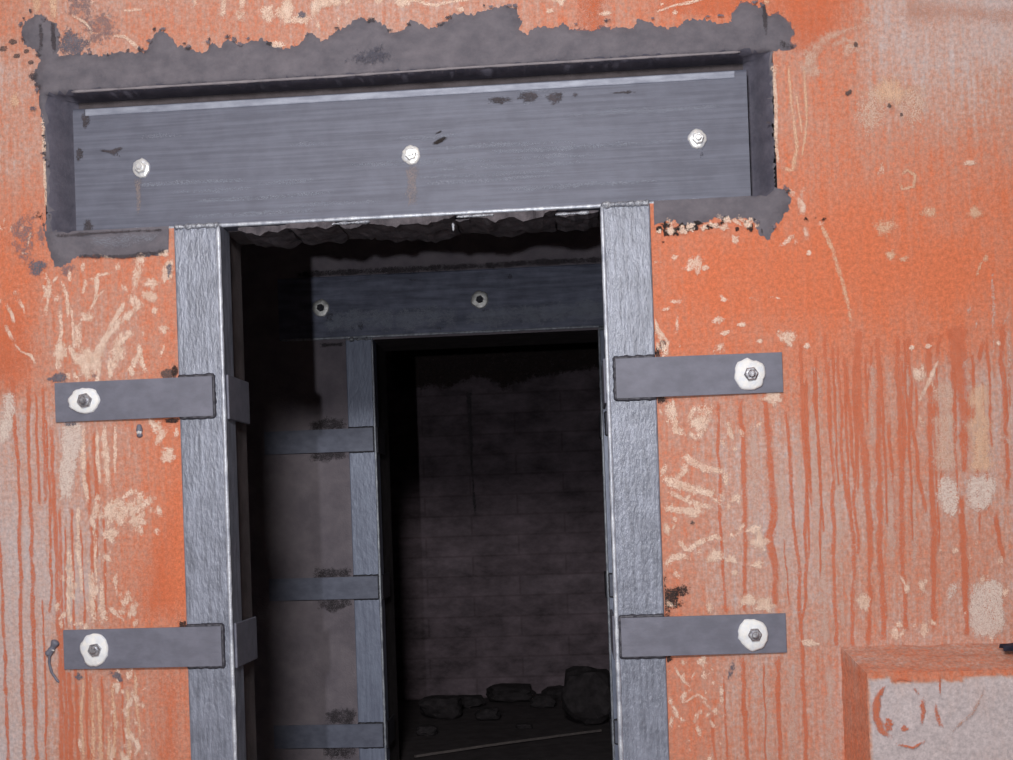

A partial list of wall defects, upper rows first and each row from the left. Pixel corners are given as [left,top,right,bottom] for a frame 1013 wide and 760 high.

peeling [487,89,577,105]
peeling [40,120,48,206]
spalling [238,209,599,249]
flaking render [656,215,759,244]
peeling [52,263,100,309]
peeling [118,283,141,318]
peeling [671,254,709,276]
peeling [712,316,746,355]
peeling [48,332,144,387]
peeling [148,418,179,464]
peeling [53,422,162,629]
peeling [75,668,150,760]